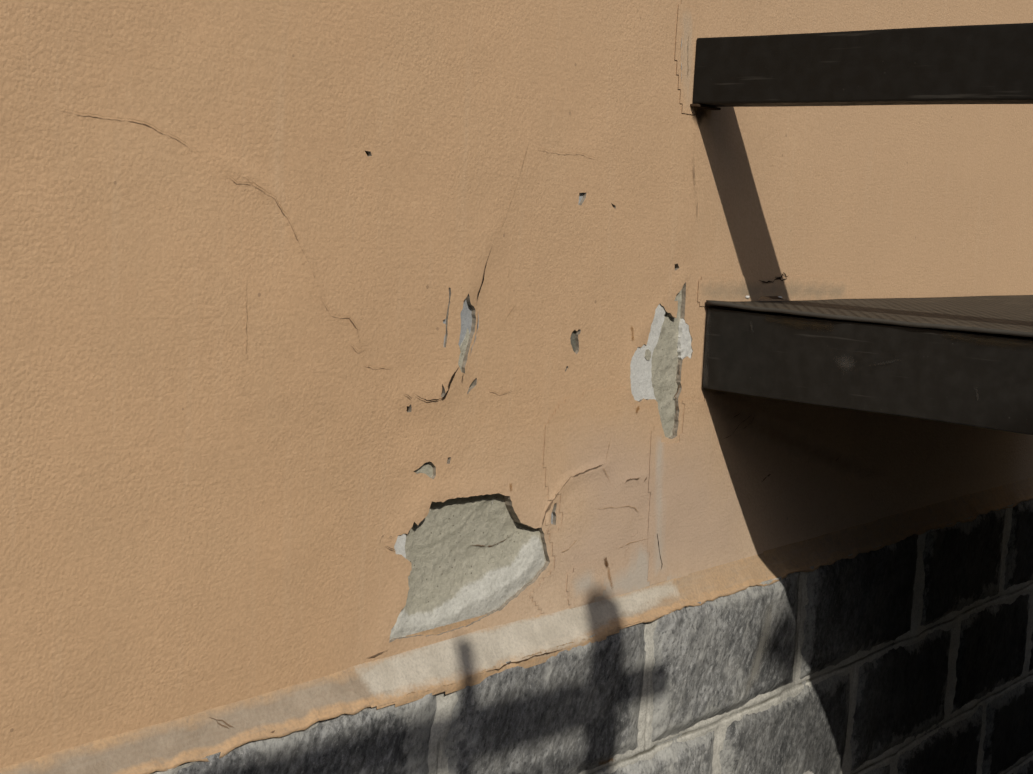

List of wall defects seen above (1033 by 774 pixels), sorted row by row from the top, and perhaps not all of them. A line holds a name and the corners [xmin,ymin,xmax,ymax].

crack [477,237,515,322]
crack [406,366,463,401]
spalling [458,299,479,372]
spalling [630,289,692,438]
peeling [414,462,433,478]
crack [542,440,647,528]
peeling [348,494,688,709]